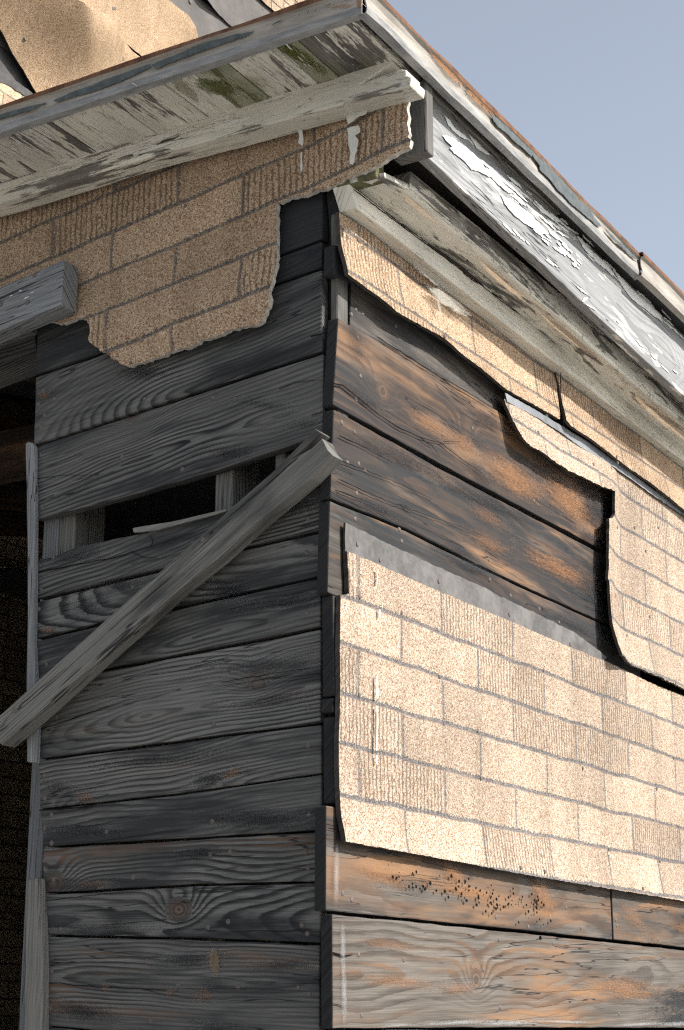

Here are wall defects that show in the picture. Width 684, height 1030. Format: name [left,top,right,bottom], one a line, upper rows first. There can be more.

peeling [315,26,365,53]
peeling [0,31,254,122]
peeling [0,114,251,186]
peeling [442,112,684,339]
peeling [428,244,501,299]